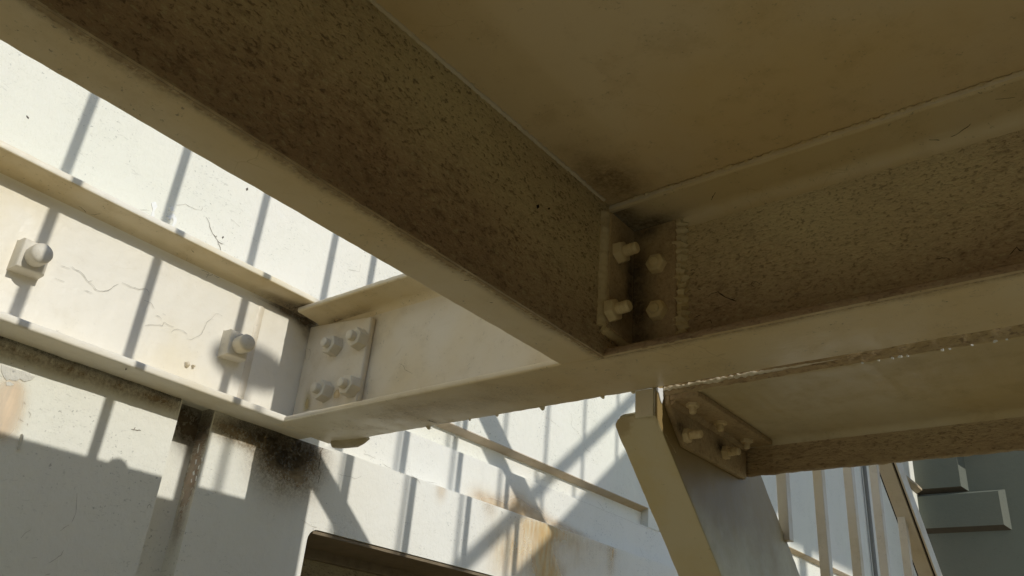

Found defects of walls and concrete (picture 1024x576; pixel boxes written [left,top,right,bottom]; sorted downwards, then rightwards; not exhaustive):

damp [234,421,320,472]
corrosion [524,522,561,576]